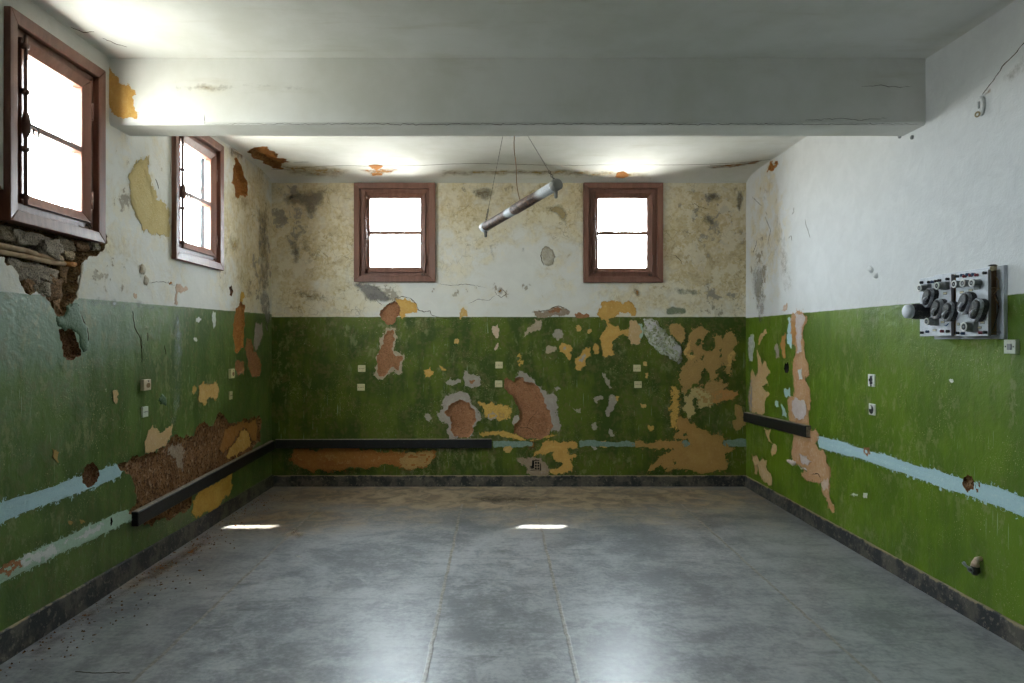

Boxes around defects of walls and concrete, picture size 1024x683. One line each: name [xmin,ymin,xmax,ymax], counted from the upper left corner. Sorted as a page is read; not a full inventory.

peeling [109,67,138,120]
peeling [127,155,172,239]
spalling [231,146,288,198]
damp [290,191,322,215]
flaking render [0,221,108,360]
damp [355,283,389,301]
peeling [524,300,643,371]
flaking render [424,366,497,439]
flaking render [503,370,619,475]
flaking render [632,303,1024,519]
flaking render [0,380,262,584]
peeling [288,448,437,474]